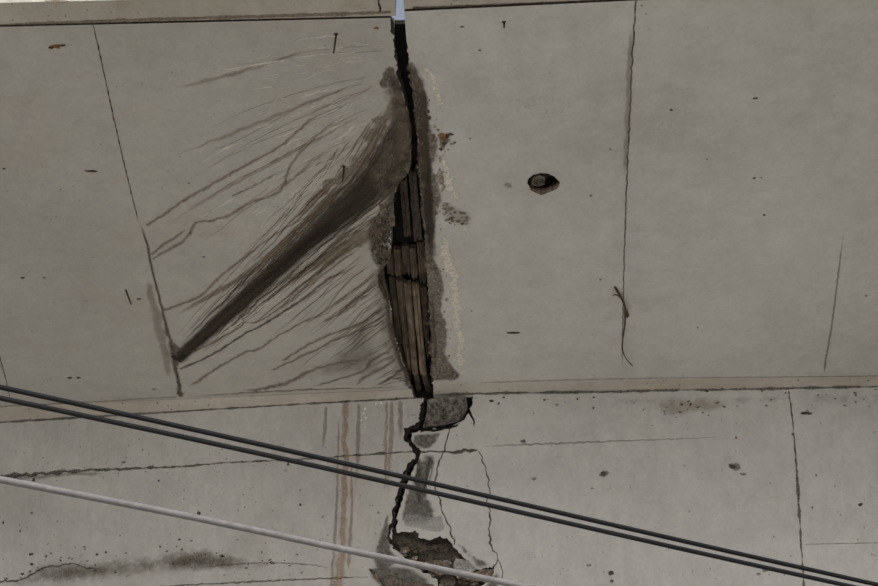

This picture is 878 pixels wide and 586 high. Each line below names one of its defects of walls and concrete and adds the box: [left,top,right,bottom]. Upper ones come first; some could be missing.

peeling [427,99,454,231]
water stain [143,64,471,397]
spalling [369,202,395,299]
crack [387,397,503,579]
water stain [0,543,96,586]
water stain [375,516,393,569]
spalling [369,528,499,586]